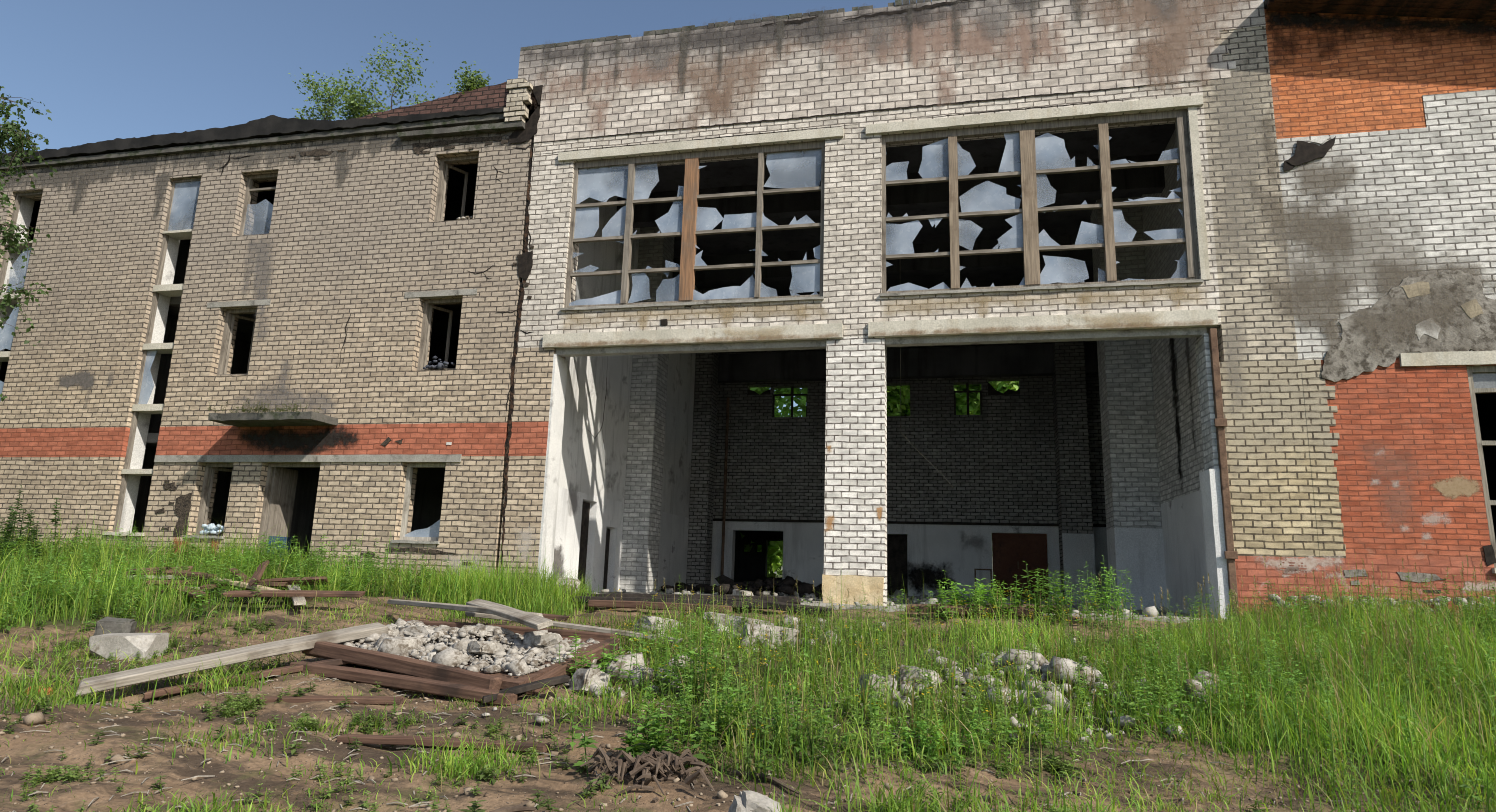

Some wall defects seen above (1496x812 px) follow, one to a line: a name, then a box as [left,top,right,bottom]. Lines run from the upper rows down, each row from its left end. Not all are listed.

leakage [529,0,1059,129]
leakage [1073,0,1237,76]
leakage [1,130,525,218]
leakage [1263,164,1355,255]
leakage [1270,273,1351,349]
flaking render [1321,270,1496,382]
leakage [1378,262,1477,292]
leakage [342,434,358,448]
spalling [155,480,192,536]